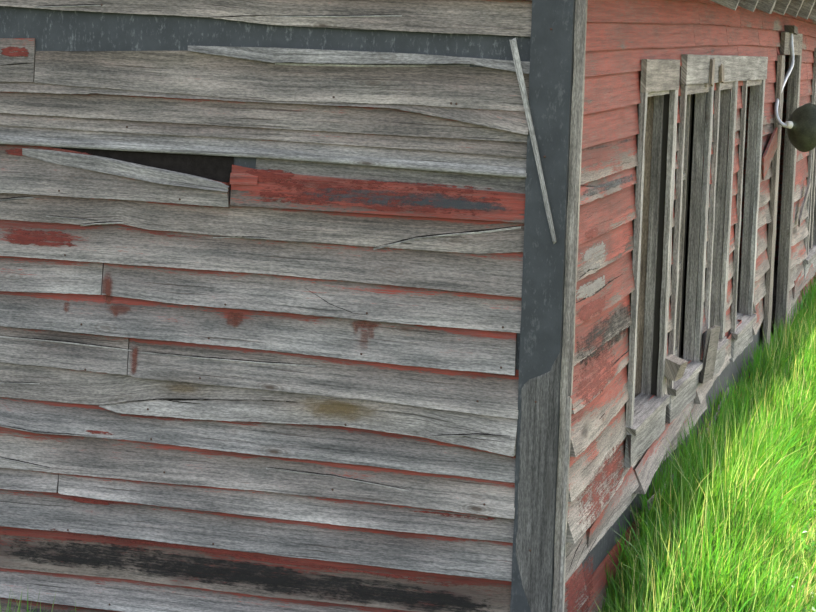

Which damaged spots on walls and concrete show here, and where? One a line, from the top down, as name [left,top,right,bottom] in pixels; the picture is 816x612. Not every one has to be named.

peeling [246,169,498,216]
crack [374,225,521,250]
peeling [576,241,606,321]
crack [101,398,294,406]
peeling [573,345,617,406]
leakage [4,538,494,612]